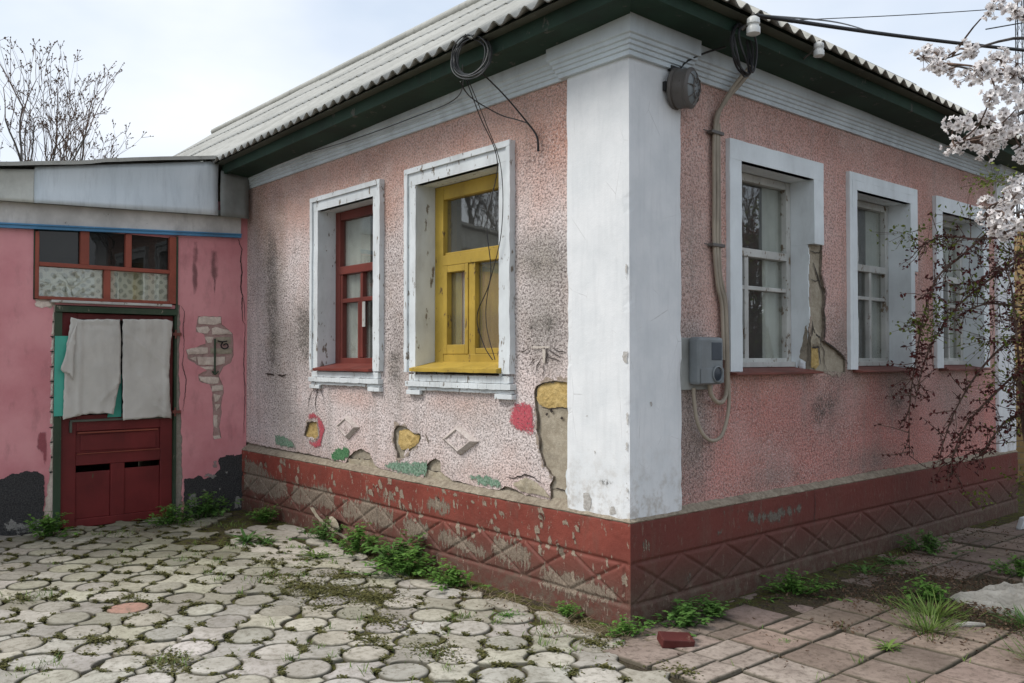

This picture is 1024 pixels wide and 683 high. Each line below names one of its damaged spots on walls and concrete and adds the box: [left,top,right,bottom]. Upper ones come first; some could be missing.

flaking render [176,305,233,517]
crack [239,242,286,419]
spalling [234,375,628,604]
spalling [798,244,845,378]